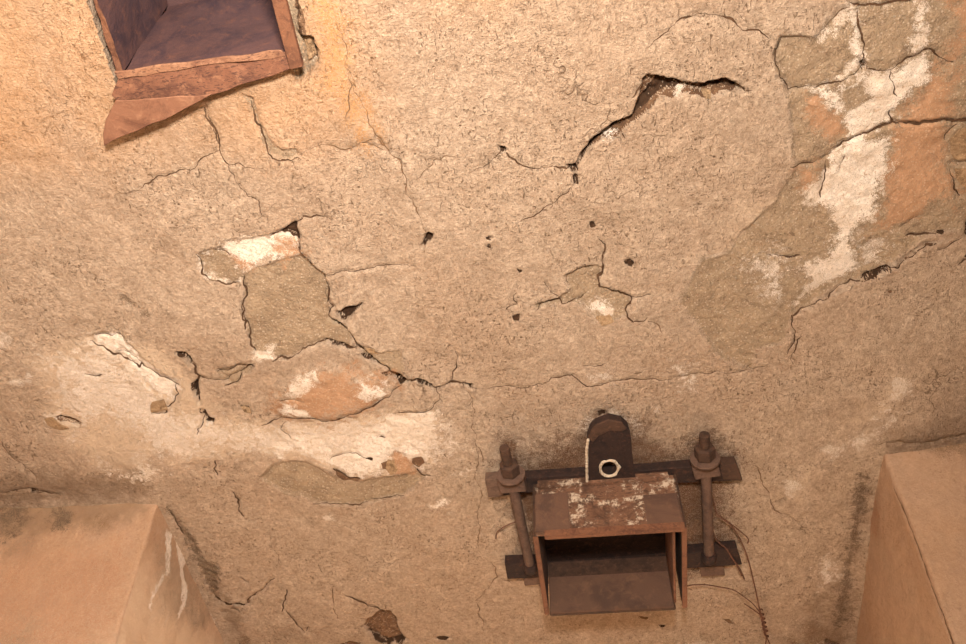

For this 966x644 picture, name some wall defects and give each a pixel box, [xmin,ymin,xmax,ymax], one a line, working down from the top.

crack [114,103,263,213]
crack [301,23,579,245]
flaking render [574,74,752,184]
peeling [680,0,966,371]
crack [791,0,966,198]
peeling [194,221,408,385]
peeling [534,239,661,331]
crack [787,216,966,364]
peeling [259,387,442,506]
crack [177,264,767,631]
corrosion [483,402,762,559]
flaking render [345,595,406,644]